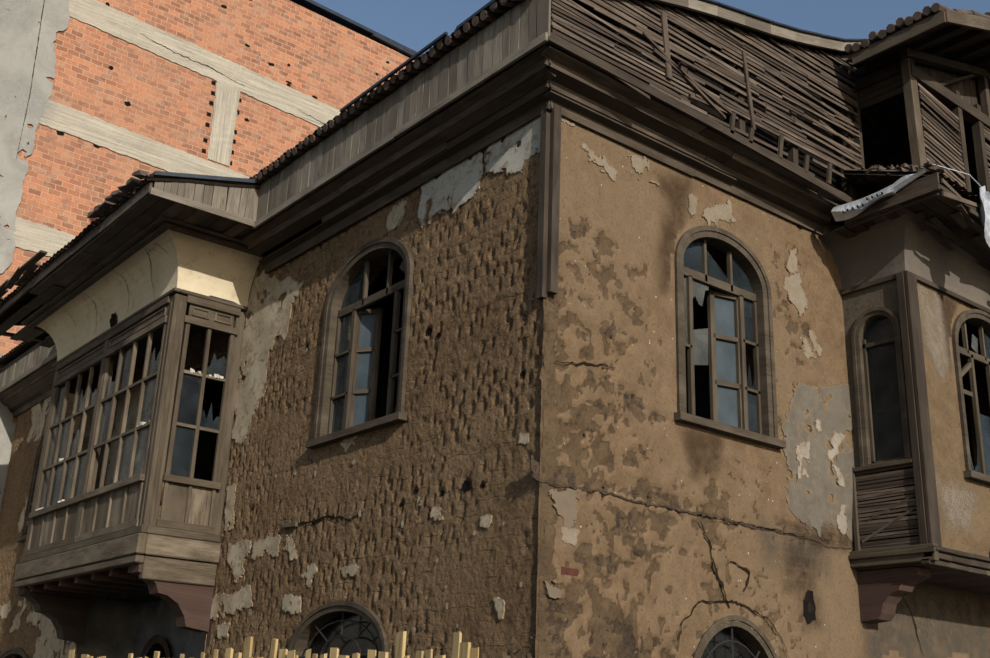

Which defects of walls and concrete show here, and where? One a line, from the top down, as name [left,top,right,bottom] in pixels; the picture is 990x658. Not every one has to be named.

spalling [556,6,615,66]
spalling [627,19,843,192]
peeling [795,441,810,480]
peeling [815,419,846,487]
crack [288,511,365,528]
peeling [836,504,848,535]
crack [535,477,855,651]